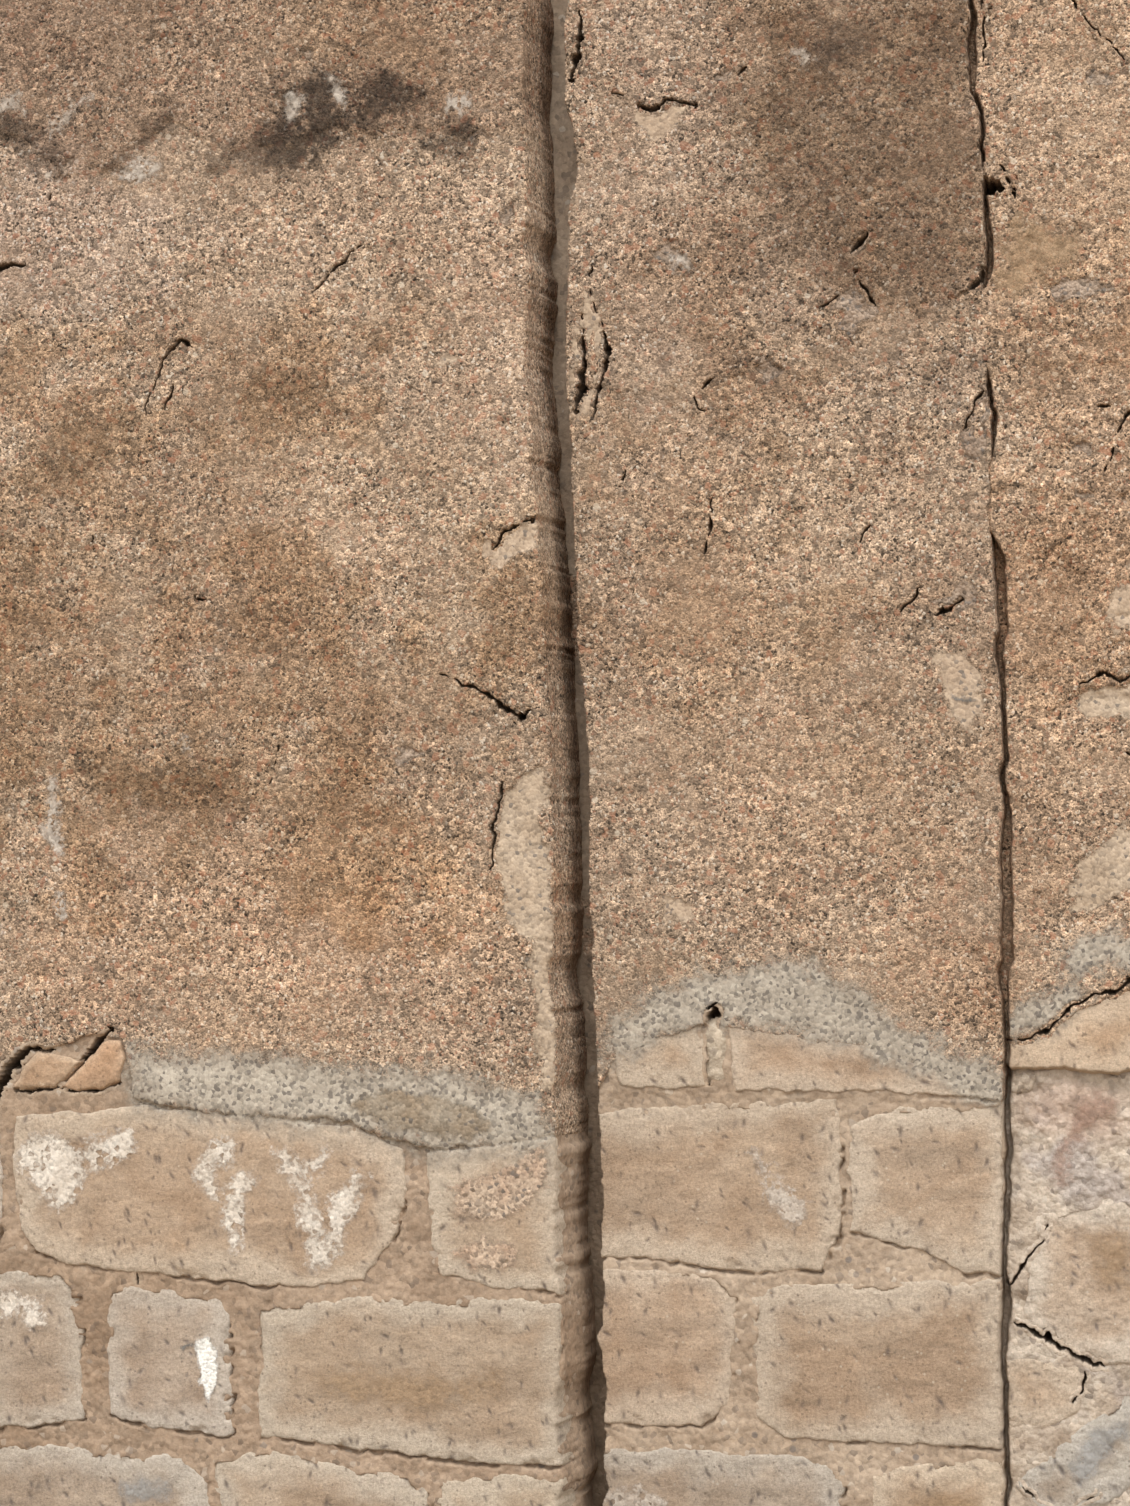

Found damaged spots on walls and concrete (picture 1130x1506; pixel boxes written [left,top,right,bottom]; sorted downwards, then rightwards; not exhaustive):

crack [0,258,26,276]
crack [139,333,194,423]
crack [569,253,617,418]
crack [435,669,532,726]
peeling [487,767,558,1090]
water stain [608,957,1002,1105]
crack [1006,973,1130,1046]
water stain [1010,927,1130,1031]
water stain [0,1129,135,1208]
water stain [124,1044,555,1274]
crack [1009,1216,1110,1405]
water stain [181,1338,218,1399]